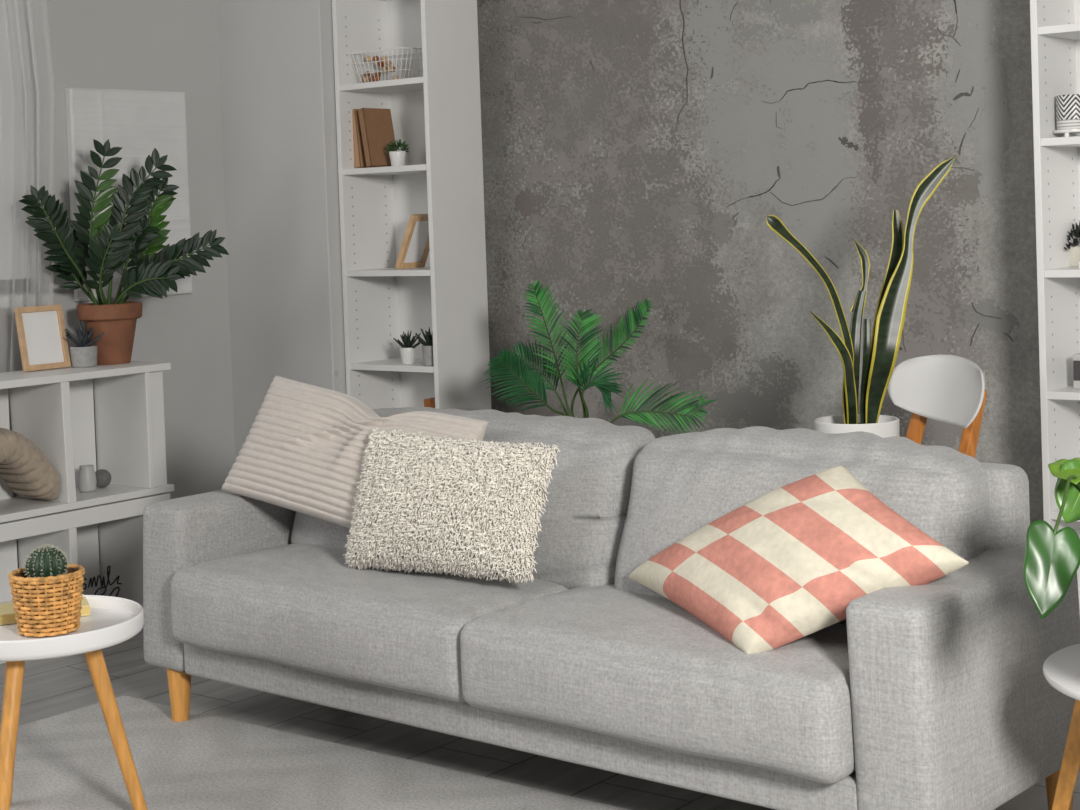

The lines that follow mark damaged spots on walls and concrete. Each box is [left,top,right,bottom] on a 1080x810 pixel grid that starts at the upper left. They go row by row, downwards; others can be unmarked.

crack [677,0,688,124]
crack [937,0,961,83]
crack [765,80,869,129]
crack [951,108,979,171]
crack [727,177,855,225]